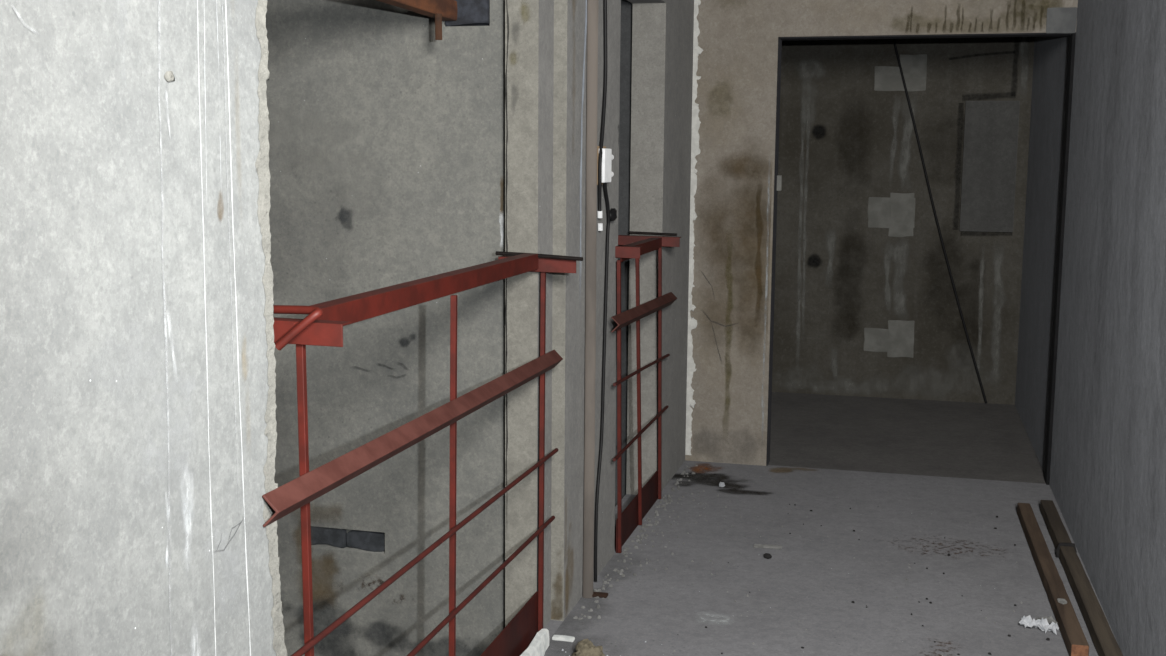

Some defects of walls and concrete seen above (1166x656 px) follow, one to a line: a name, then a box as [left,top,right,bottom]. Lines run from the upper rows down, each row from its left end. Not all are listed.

water stain [890,109,914,181]
water stain [797,107,809,342]
water stain [977,256,1003,375]